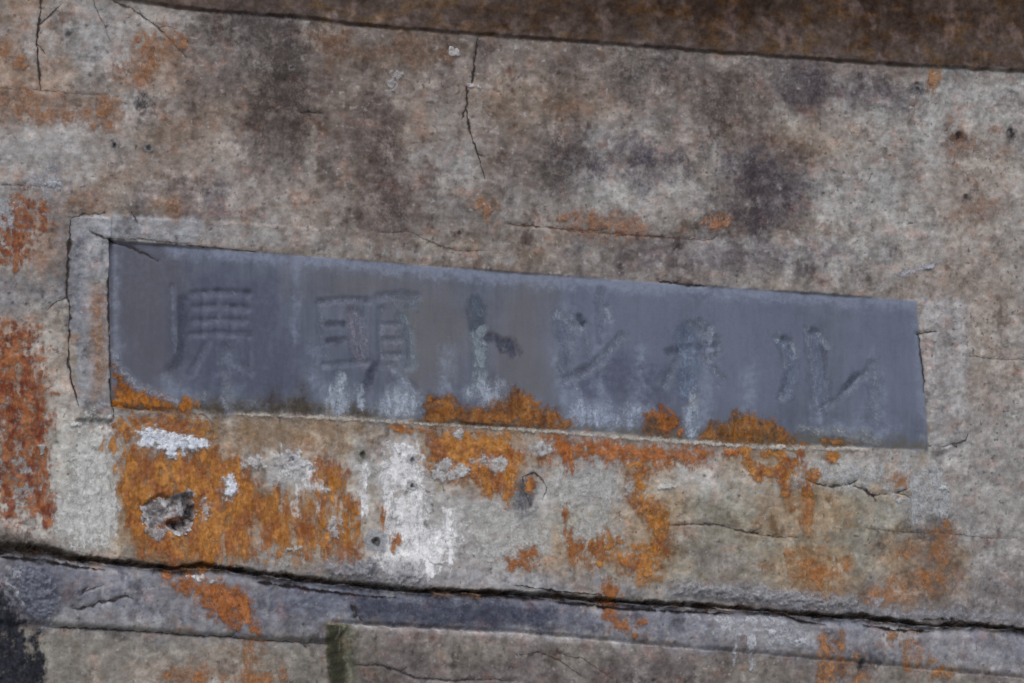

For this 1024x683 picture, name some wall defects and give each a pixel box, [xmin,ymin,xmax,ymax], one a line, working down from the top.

crack [2,0,67,97]
rust [0,317,60,534]
water stain [111,349,180,404]
crack [48,212,255,419]
spalling [140,488,210,541]
rust [91,296,364,683]
peeling [223,452,306,501]
peeling [327,516,343,539]
water stain [357,441,637,635]
crack [0,541,1024,646]
water stain [197,373,953,572]
rust [388,387,856,639]